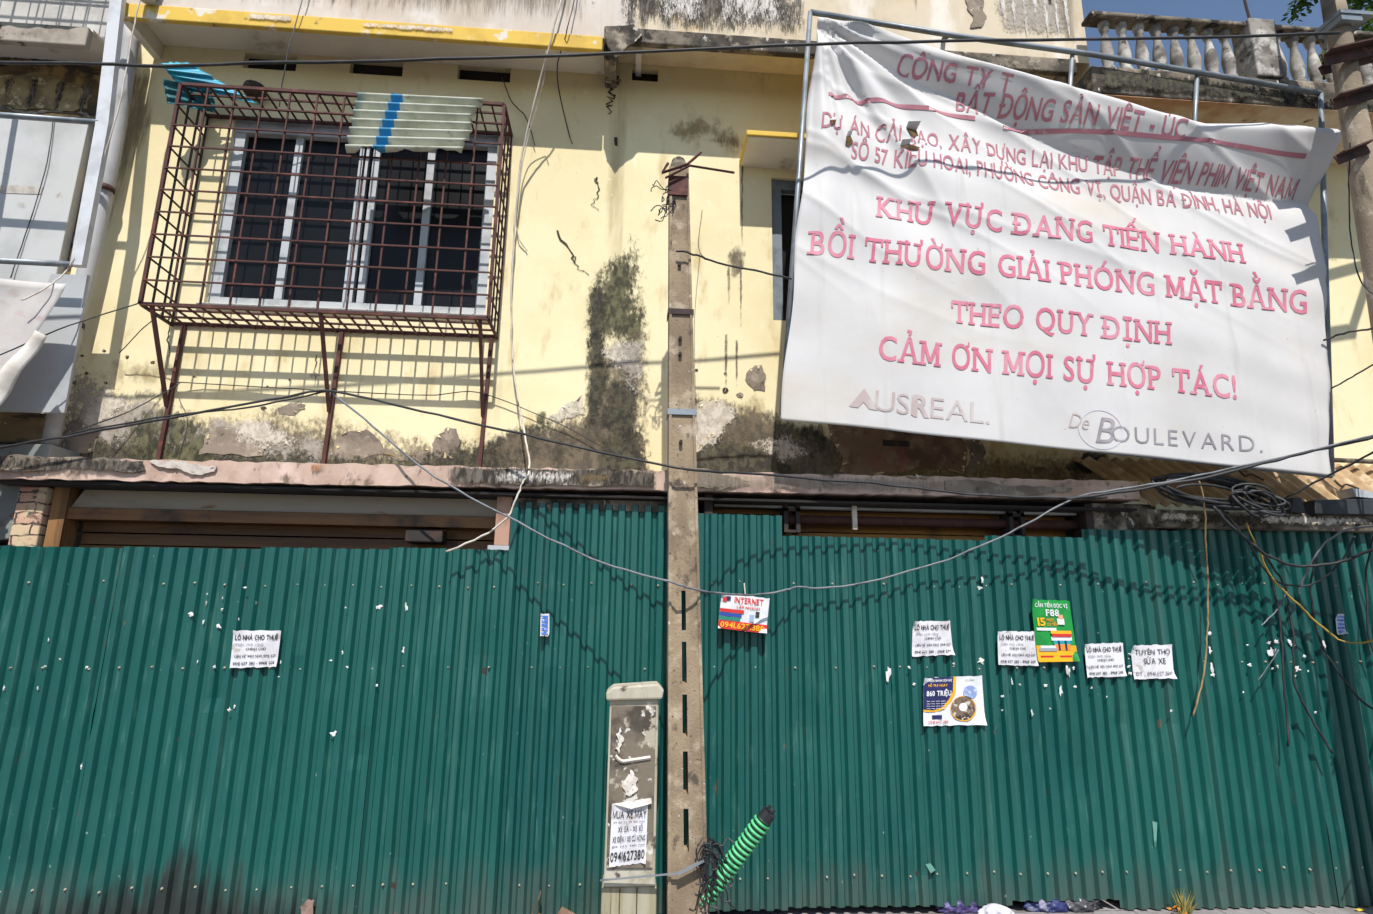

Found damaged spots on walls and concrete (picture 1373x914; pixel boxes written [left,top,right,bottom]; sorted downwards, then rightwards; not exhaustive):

damp [622,0,805,32]
peeling [965,0,987,29]
damp [0,239,656,486]
peeling [695,365,766,491]